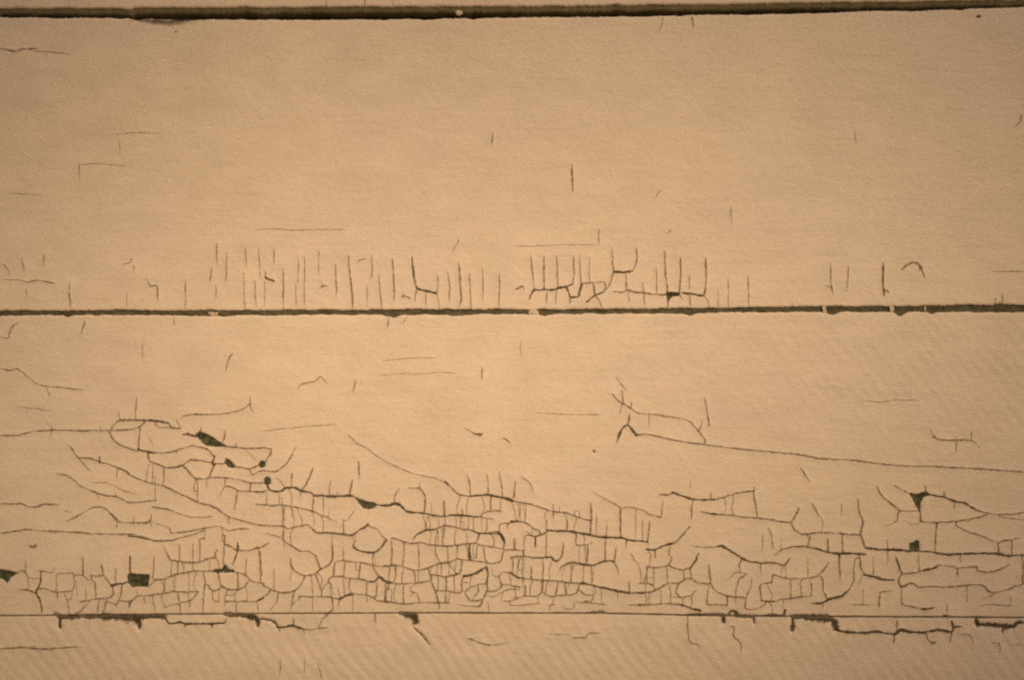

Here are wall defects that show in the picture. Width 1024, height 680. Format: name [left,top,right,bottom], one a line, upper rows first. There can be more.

crack [185,229,749,325]
peeling [196,431,235,468]
crack [0,368,1024,650]
peeling [910,491,929,512]
peeling [0,569,18,583]
peeling [127,573,150,587]